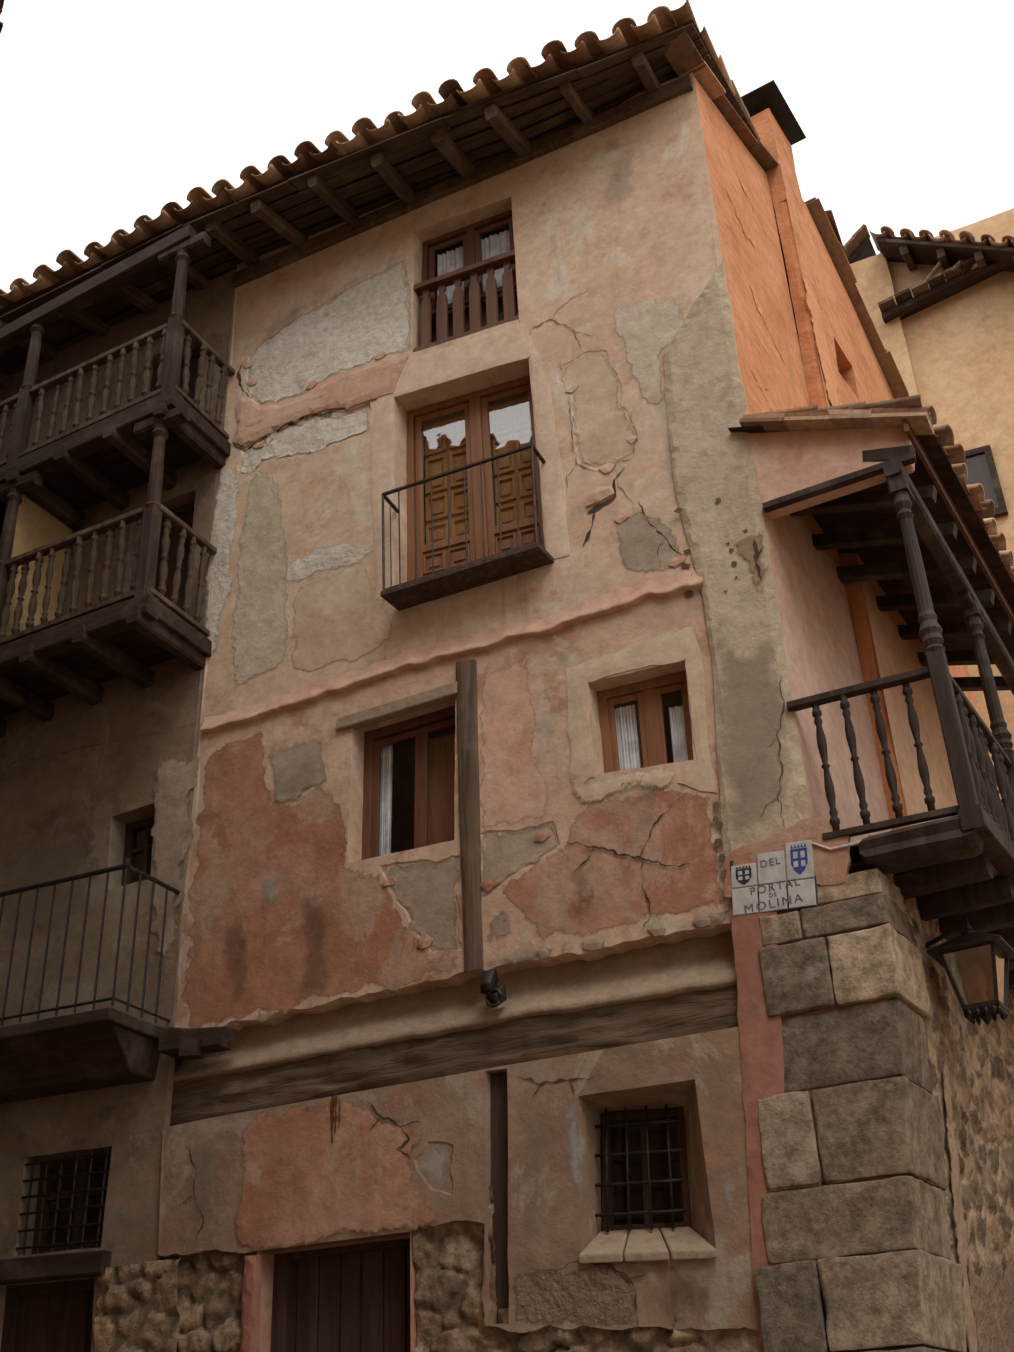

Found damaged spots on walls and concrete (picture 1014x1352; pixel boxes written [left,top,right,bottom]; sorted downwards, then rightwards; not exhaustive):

peeling [243,262,411,403]
crack [519,289,690,570]
peeling [205,402,373,653]
peeling [614,508,693,597]
peeling [479,659,548,830]
peeling [150,731,460,1028]
peeling [489,768,729,964]
crack [565,792,692,930]
crack [367,1101,421,1160]